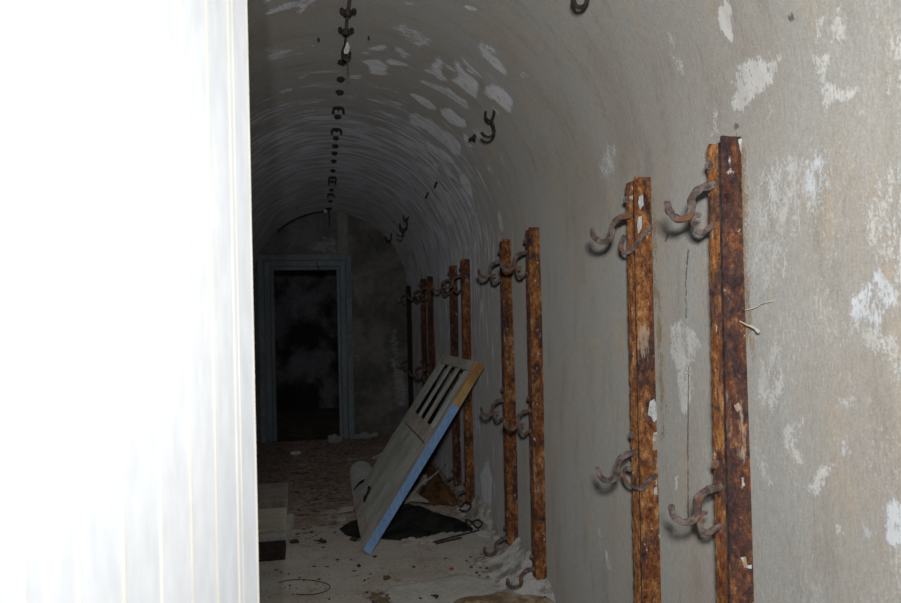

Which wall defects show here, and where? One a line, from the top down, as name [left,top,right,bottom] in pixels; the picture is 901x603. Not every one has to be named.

peeling [730,53,782,118]
rust [741,142,757,363]